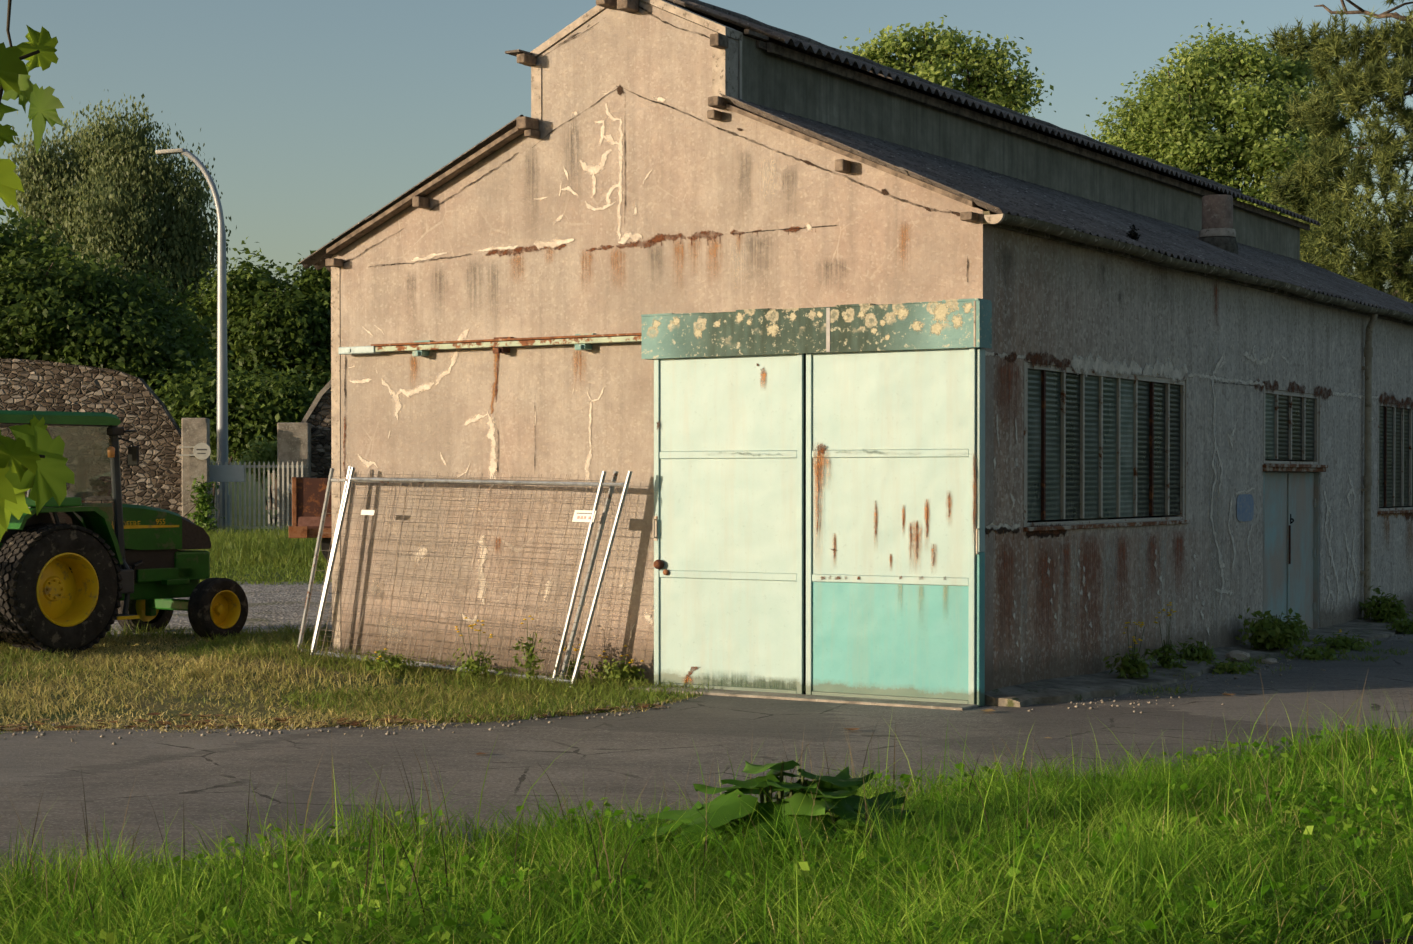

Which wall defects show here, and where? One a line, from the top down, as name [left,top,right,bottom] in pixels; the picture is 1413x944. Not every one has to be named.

corrosion [486,244,566,263]
peeling [479,238,574,252]
peeling [618,233,642,244]
corrosion [582,224,837,266]
corrosion [985,351,1070,371]
corrosion [491,353,499,414]
corrosion [1254,378,1333,400]
corrosion [1379,390,1413,410]
corrosion [814,444,838,556]
corrosion [902,499,934,577]
corrosion [1026,522,1069,621]